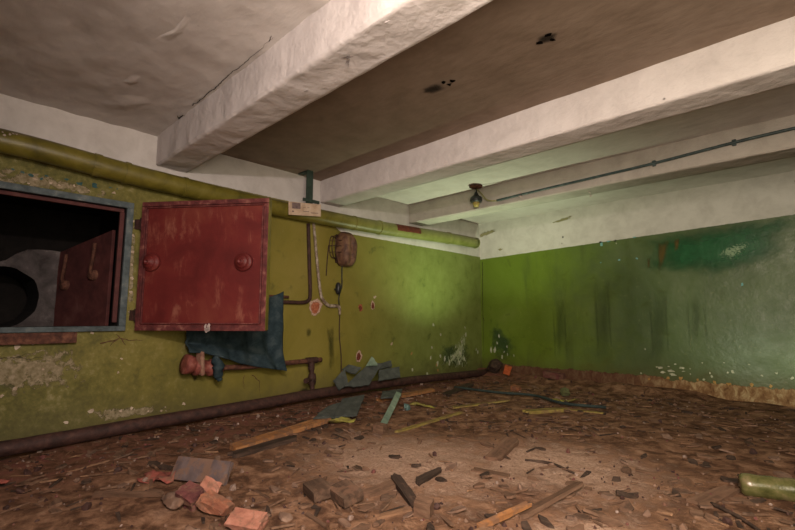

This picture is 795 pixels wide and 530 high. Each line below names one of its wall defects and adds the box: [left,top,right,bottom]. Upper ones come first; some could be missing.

peeling [0,344,85,398]
flaking render [500,364,795,407]